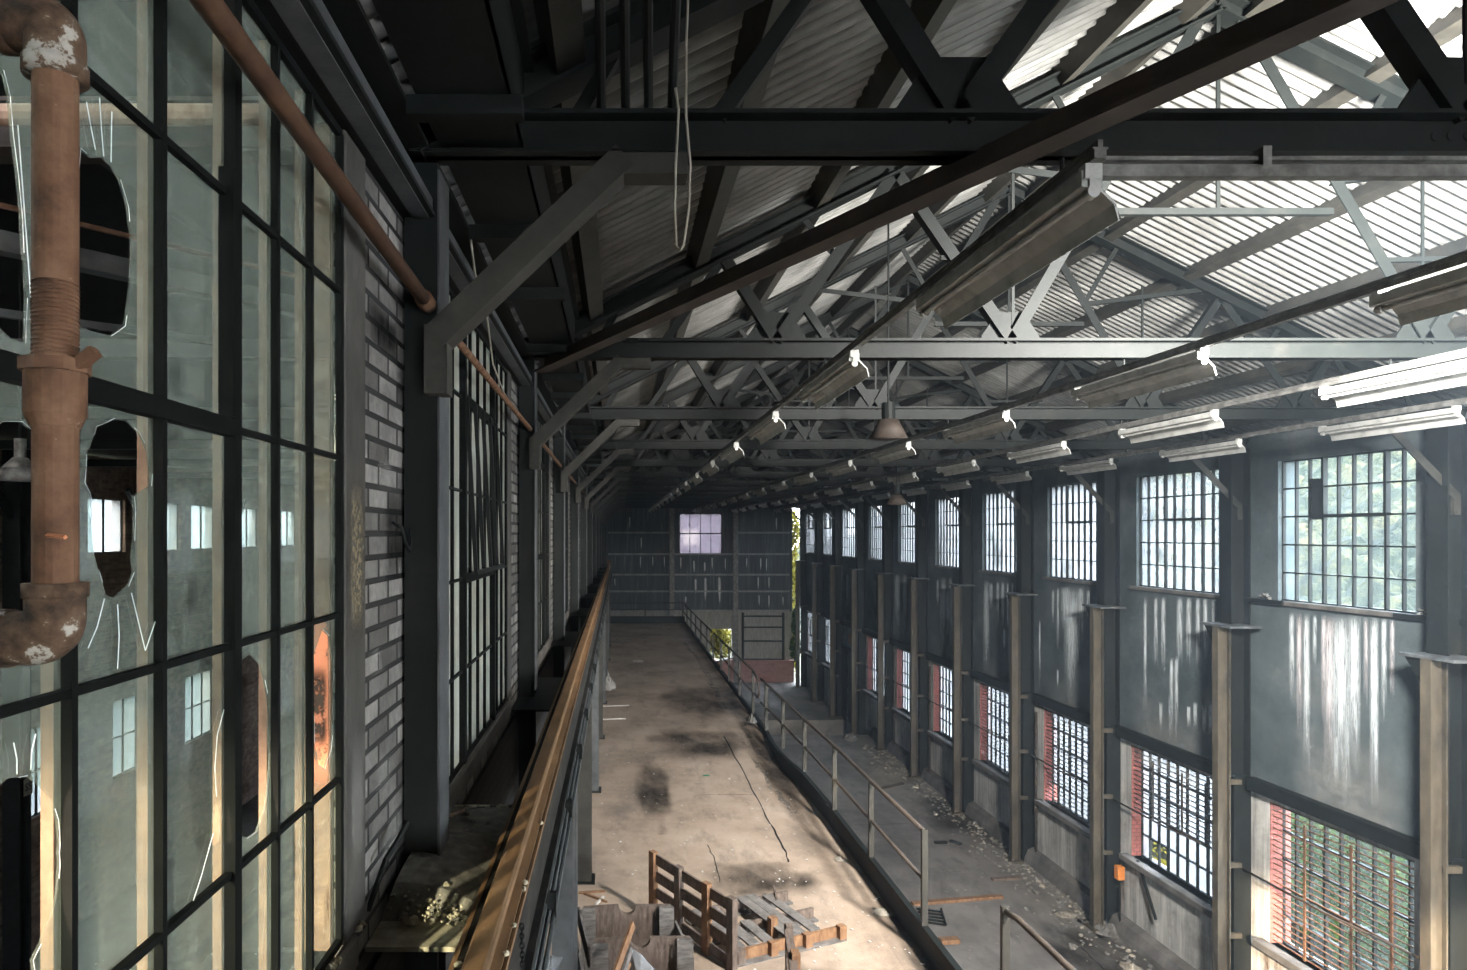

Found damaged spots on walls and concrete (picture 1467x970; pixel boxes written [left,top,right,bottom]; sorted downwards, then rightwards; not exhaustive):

water stain [1290,617,1394,769]
crack [723,736,789,862]